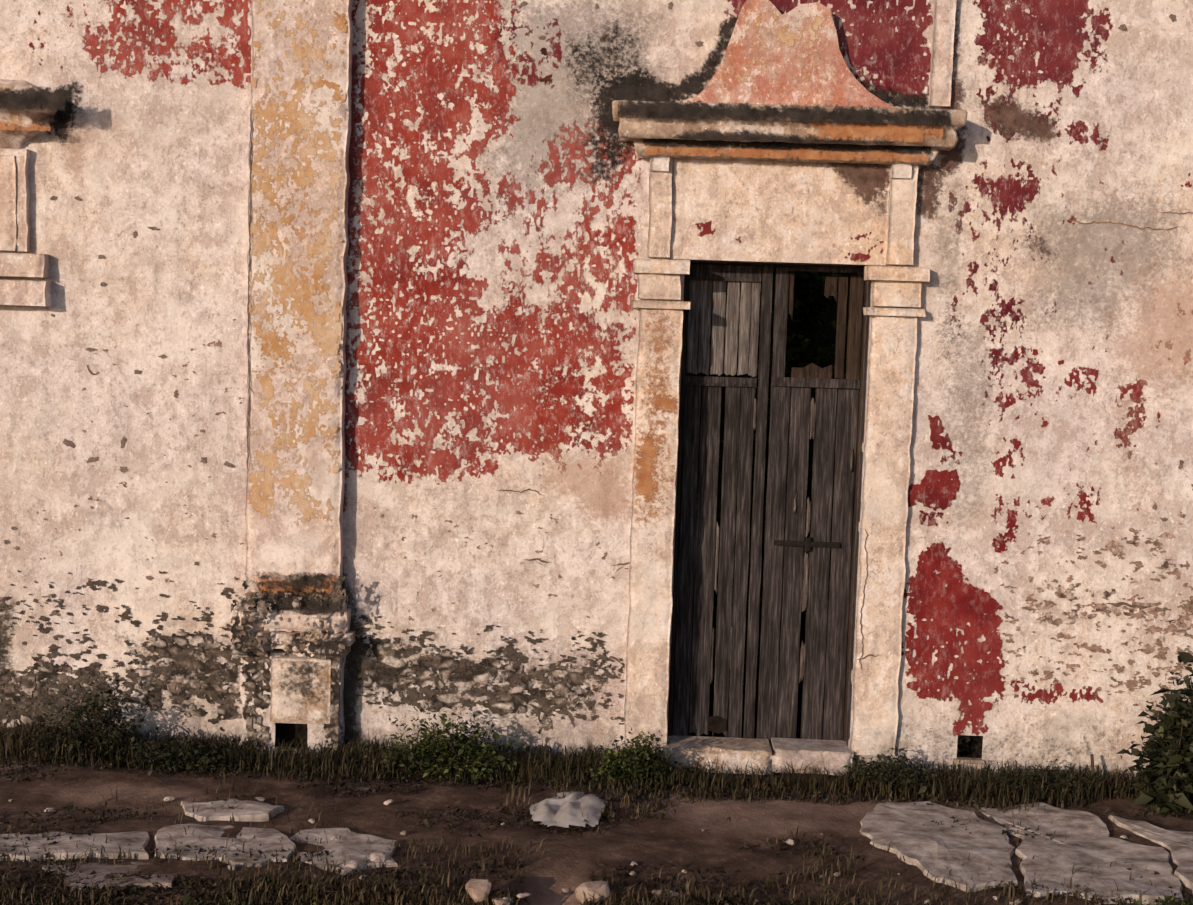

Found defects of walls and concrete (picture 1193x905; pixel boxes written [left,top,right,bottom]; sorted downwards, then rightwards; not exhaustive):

damp [565,3,967,218]
damp [979,95,1057,142]
peeling [973,0,1127,151]
peeling [66,0,641,526]
peeling [949,158,1099,428]
crack [1069,211,1191,230]
peeling [907,415,962,527]
peeling [991,437,1025,479]
peeling [1113,379,1161,459]
damp [235,557,348,616]
flaking render [0,570,625,759]
peeling [901,483,1193,765]